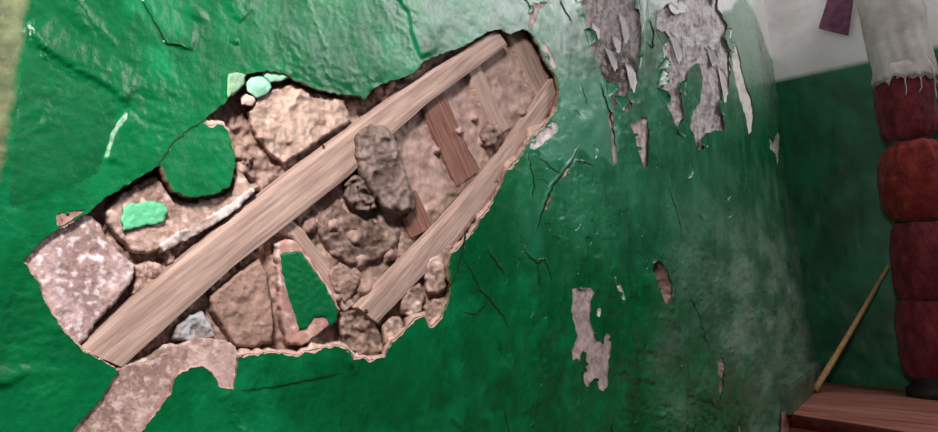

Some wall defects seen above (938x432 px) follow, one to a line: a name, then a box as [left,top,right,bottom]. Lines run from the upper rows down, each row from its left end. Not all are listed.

peeling [575,0,667,176]
peeling [656,0,754,150]
flaking render [23,0,560,432]
crack [445,226,509,327]
crack [523,144,595,283]
peeling [537,285,612,404]
flaking render [635,247,679,306]